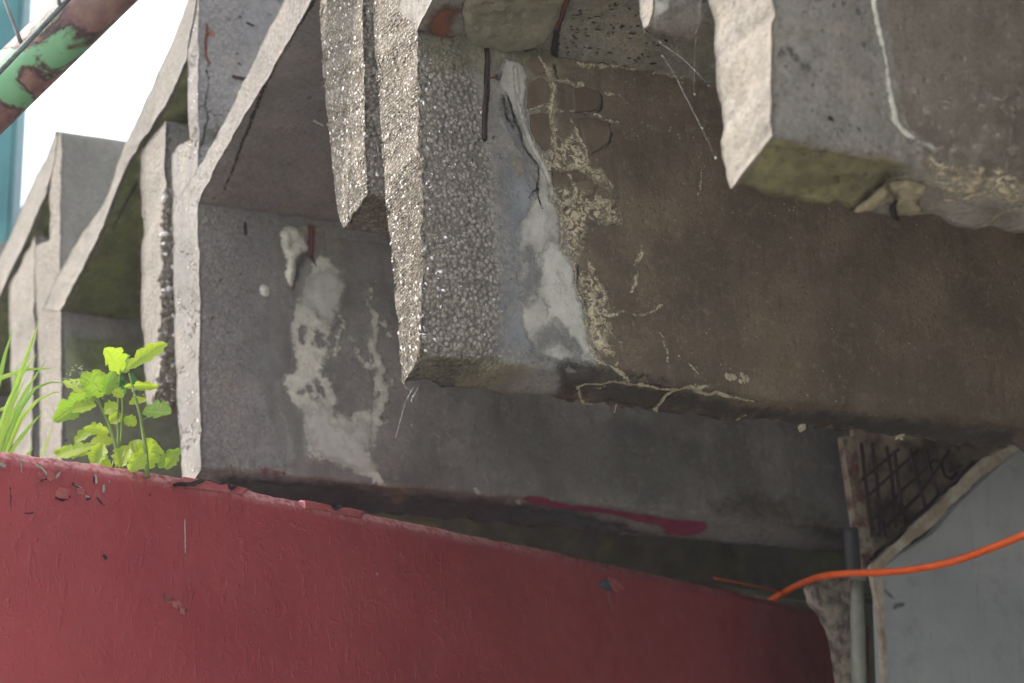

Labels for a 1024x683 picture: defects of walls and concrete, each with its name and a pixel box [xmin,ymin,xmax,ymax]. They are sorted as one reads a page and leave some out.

crack [199,24,222,146]
damp [500,55,1014,449]
spalling [850,173,927,221]
damp [871,0,1024,228]
peeling [35,463,110,504]
damp [217,224,683,540]
flaking render [867,445,1019,683]